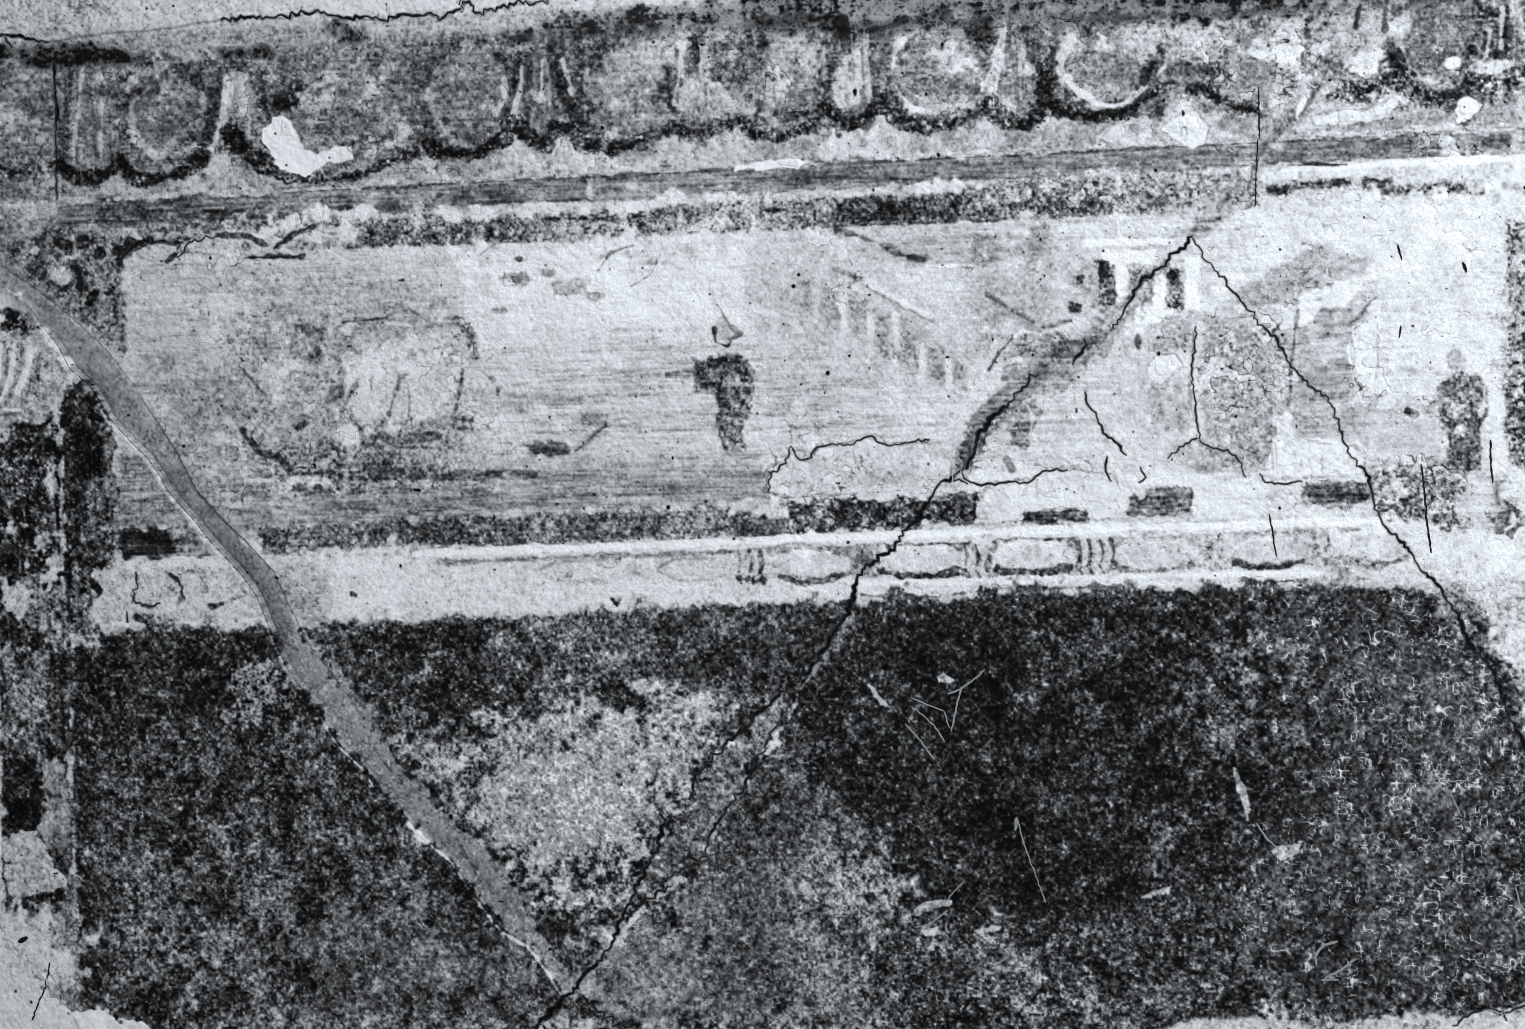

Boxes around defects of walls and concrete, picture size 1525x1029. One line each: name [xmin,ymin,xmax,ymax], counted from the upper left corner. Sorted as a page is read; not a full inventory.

spalling [263,116,353,177]
crack [118,235,218,267]
crack [273,226,309,249]
crack [131,572,184,609]
crack [527,235,1525,1029]